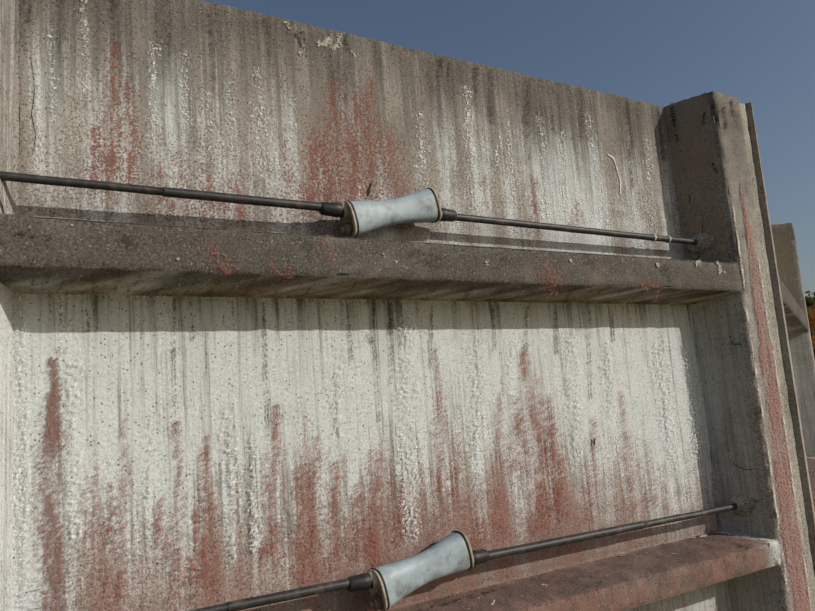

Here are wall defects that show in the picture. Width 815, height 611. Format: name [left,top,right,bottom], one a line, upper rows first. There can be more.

water stain [90,0,159,204]
water stain [146,143,247,229]
water stain [251,67,271,177]
water stain [283,78,430,202]
water stain [463,66,495,211]
water stain [495,78,582,239]
water stain [153,420,221,607]
water stain [220,288,604,588]